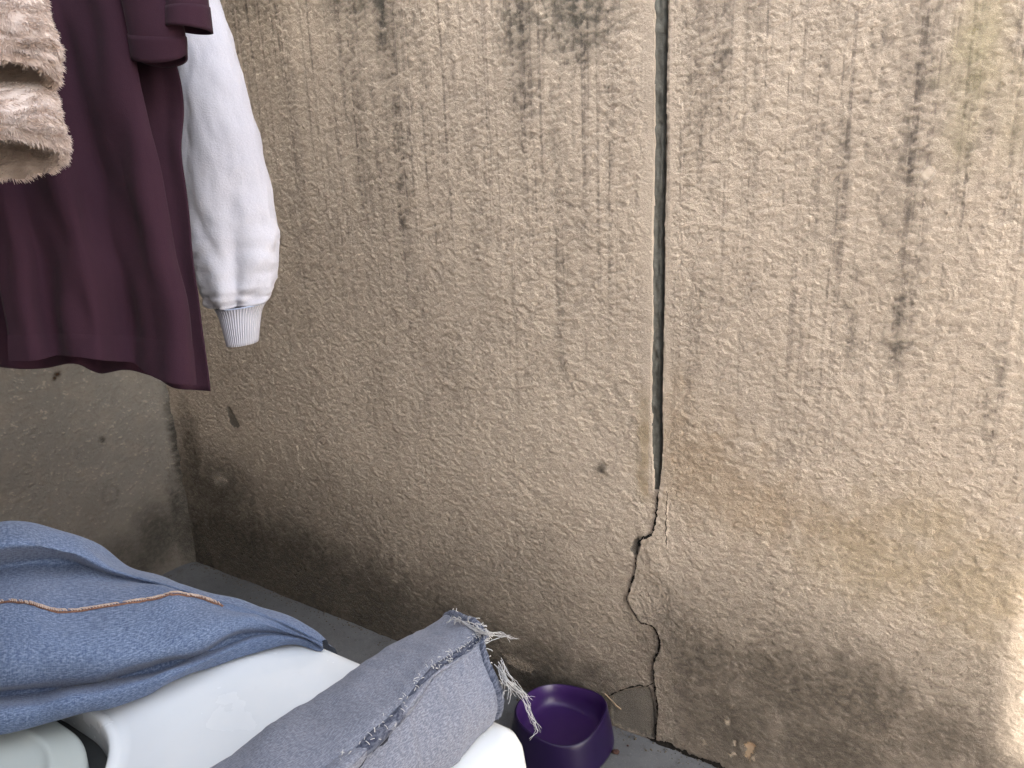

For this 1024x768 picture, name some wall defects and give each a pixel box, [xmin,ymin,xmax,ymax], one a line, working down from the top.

leakage [118,412,445,641]
leakage [485,629,576,692]
crack [609,491,670,739]